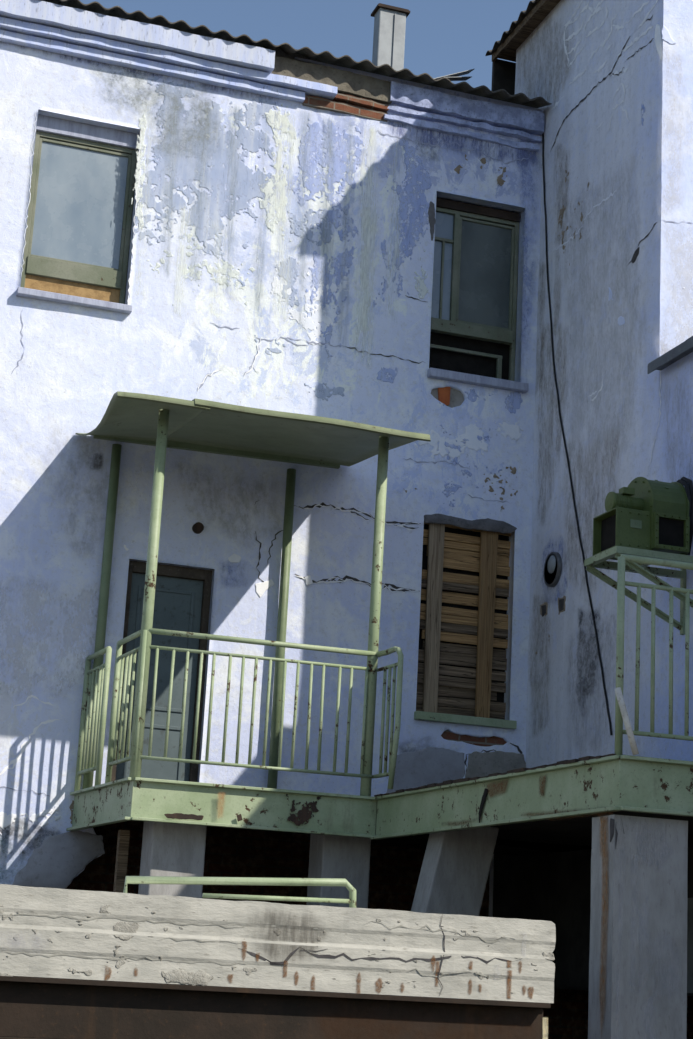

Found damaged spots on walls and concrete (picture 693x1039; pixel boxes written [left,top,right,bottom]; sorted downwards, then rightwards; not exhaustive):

peeling [131,76,369,358]
peeling [372,139,436,308]
crack [626,219,691,267]
crack [198,323,423,390]
peeling [304,383,345,401]
spalling [431,387,523,414]
crack [295,574,419,593]
peeling [0,801,74,835]
corrosion [286,794,321,826]
corrosion [598,811,613,1025]
crack [0,913,520,996]
corrosion [507,961,533,998]